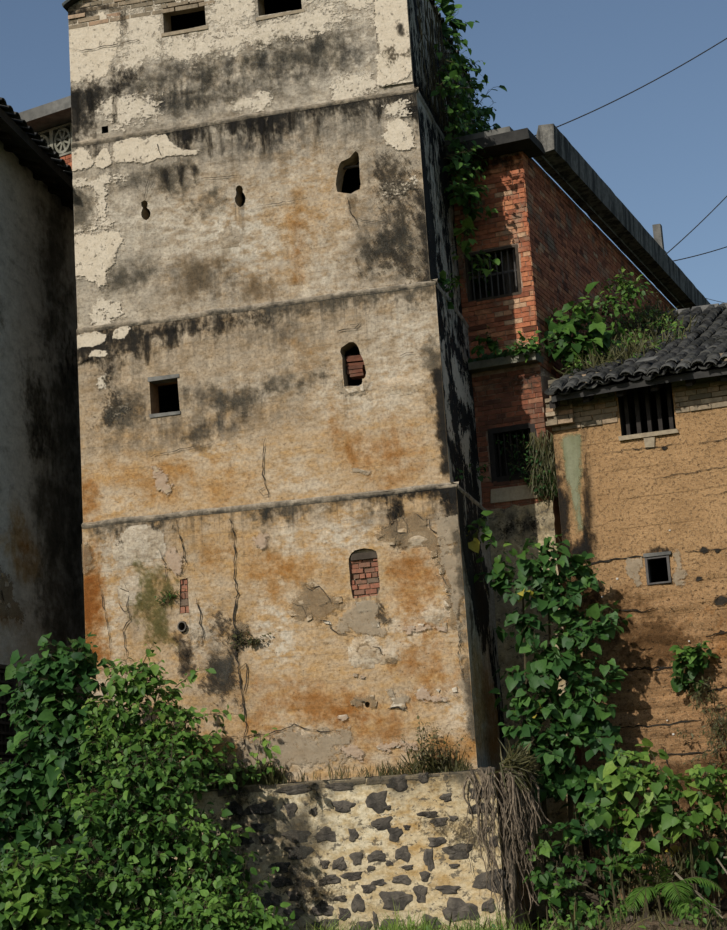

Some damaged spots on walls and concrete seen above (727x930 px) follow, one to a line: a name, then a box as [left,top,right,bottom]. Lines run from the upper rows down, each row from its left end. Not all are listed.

damp [71,88,101,142]
damp [158,127,204,146]
damp [229,109,287,134]
peeling [69,0,418,358]
damp [77,318,199,361]
damp [390,0,504,754]
crack [212,519,337,748]
flaking render [323,600,388,650]
crack [611,606,658,614]
crack [624,665,672,673]